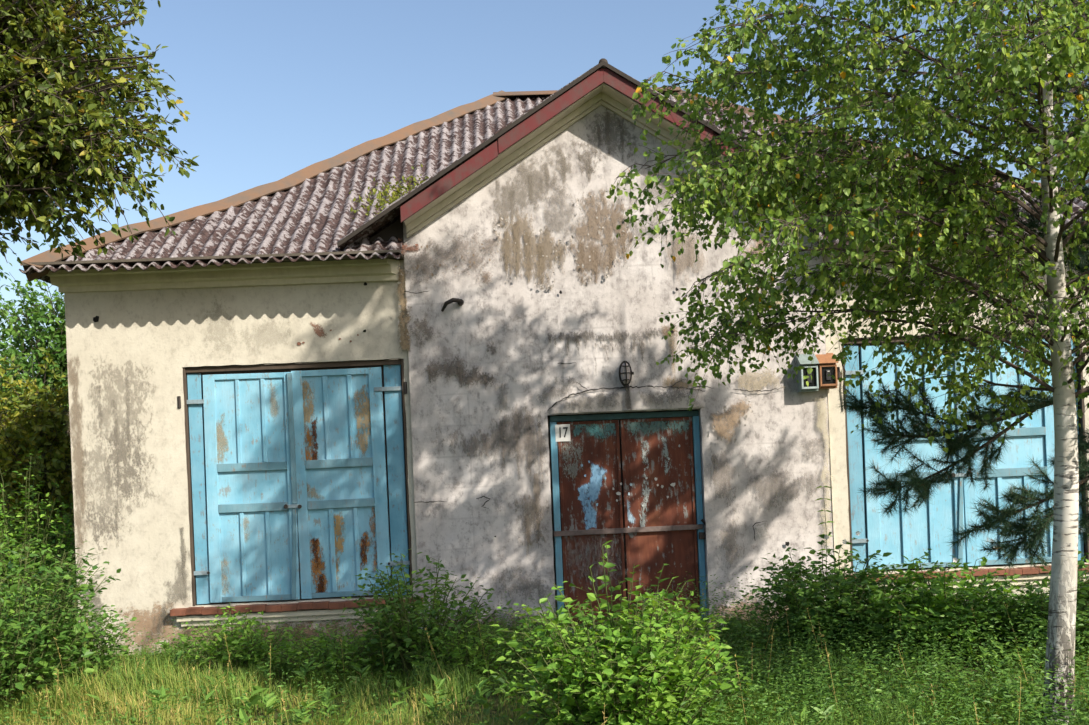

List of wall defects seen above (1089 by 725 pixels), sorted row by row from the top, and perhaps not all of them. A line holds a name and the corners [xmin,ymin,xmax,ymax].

leakage [491,112,636,238]
leakage [404,234,495,282]
flaking render [310,323,366,342]
leakage [548,328,661,360]
corrosion [302,380,318,460]
corrosion [354,389,371,454]
leakage [426,357,695,553]
peeling [561,417,693,530]
leakage [710,451,822,510]
corrosion [310,511,344,593]
corrosion [360,508,377,571]